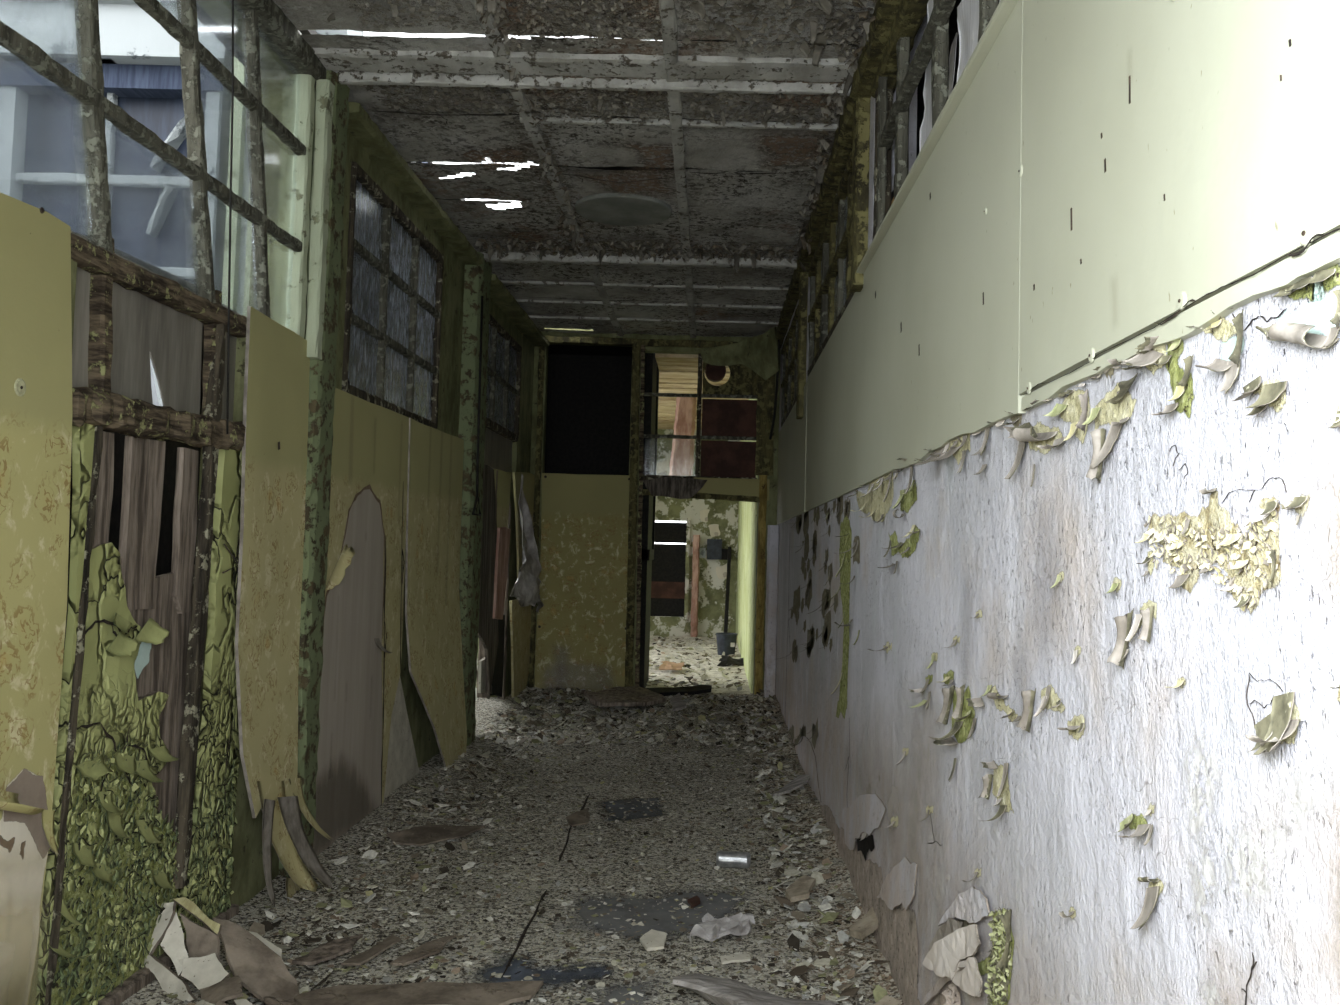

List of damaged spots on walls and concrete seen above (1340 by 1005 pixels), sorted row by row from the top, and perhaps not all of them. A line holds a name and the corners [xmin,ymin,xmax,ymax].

crack [1020,228,1340,396]
peeling [780,264,1340,719]
peeling [908,635,1085,782]
peeling [1245,692,1300,755]
peeling [1115,803,1155,846]
spalling [788,719,1014,1005]
spalling [1225,826,1285,899]
peeling [1059,907,1076,919]
peeling [1130,876,1164,930]